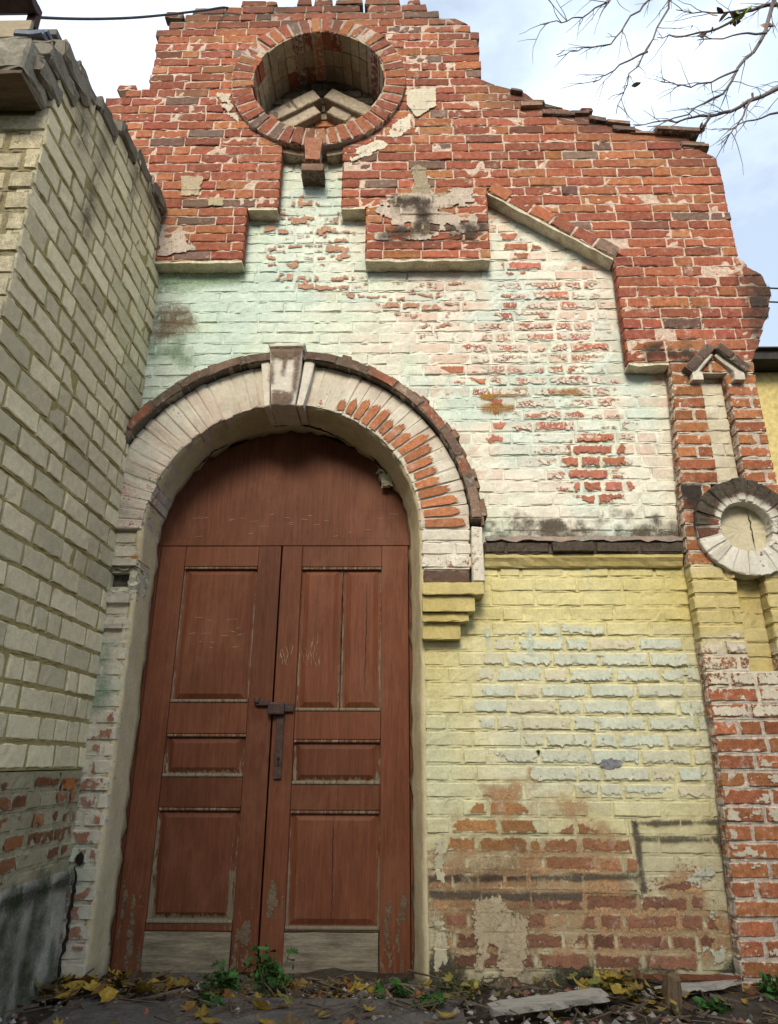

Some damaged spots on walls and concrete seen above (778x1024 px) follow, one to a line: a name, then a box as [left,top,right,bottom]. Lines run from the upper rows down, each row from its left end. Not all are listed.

water stain [154,310,192,338]
peeling [263,190,471,338]
peeling [441,233,638,510]
water stain [125,347,601,537]
peeling [336,397,466,527]
spalling [446,422,488,531]
water stain [616,514,680,537]
flaking render [0,710,114,886]
peeling [434,794,637,889]
water stain [0,865,75,1019]
crack [57,852,84,979]
peeling [433,864,727,982]